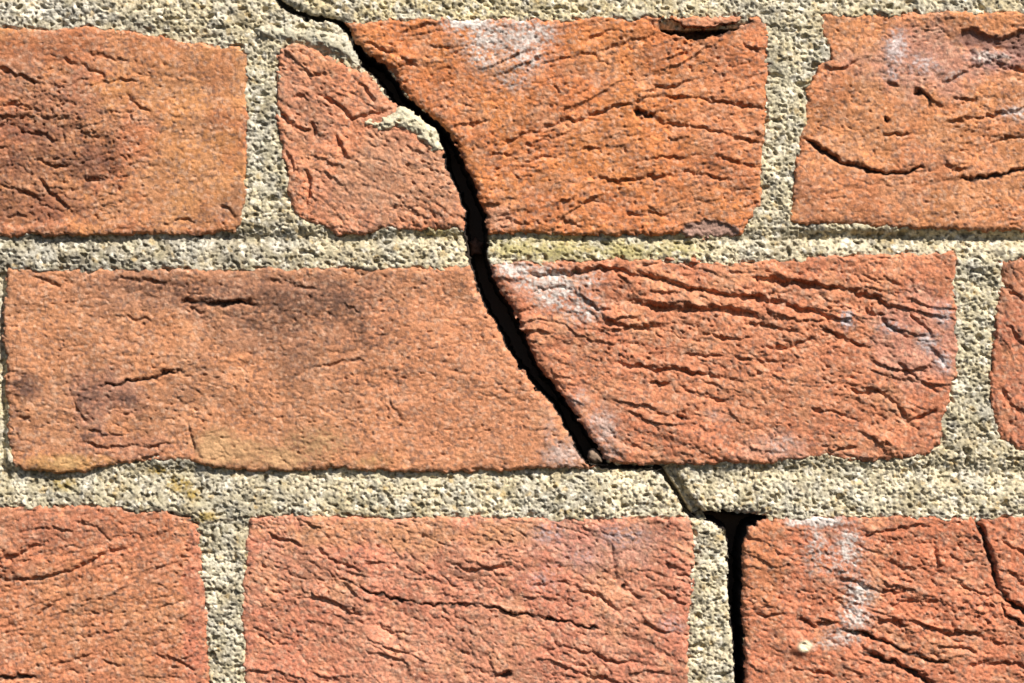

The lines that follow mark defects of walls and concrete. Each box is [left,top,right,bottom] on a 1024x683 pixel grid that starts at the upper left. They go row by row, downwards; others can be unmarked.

crack [276,0,767,683]